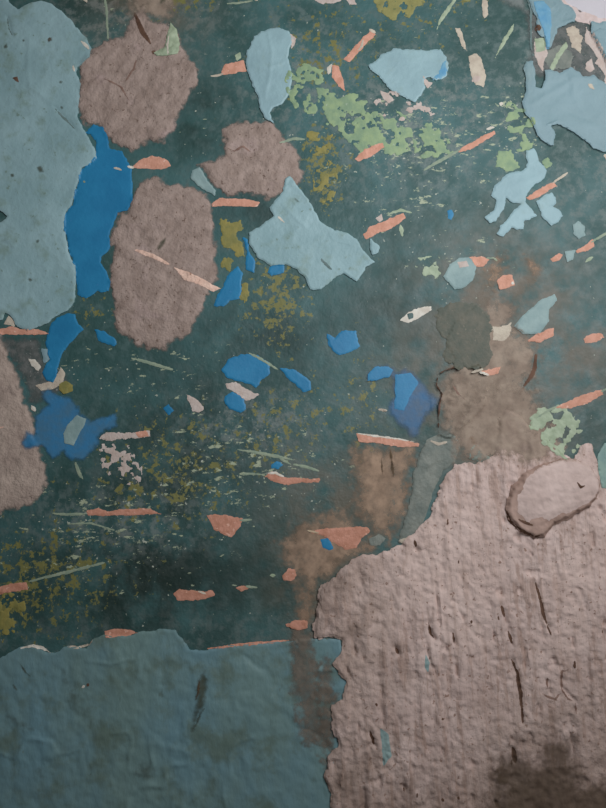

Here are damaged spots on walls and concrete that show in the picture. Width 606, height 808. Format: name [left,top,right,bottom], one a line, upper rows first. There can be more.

peeling [368,48,449,117]
peeling [455,28,486,87]
peeling [499,0,606,159]
flaking render [95,28,412,350]
peeling [484,148,568,237]
peeling [0,0,198,515]
peeling [443,256,497,290]
peeling [550,221,606,262]
peeling [400,306,432,323]
peeling [492,294,557,343]
peeling [356,433,419,447]
flaking render [0,443,606,808]